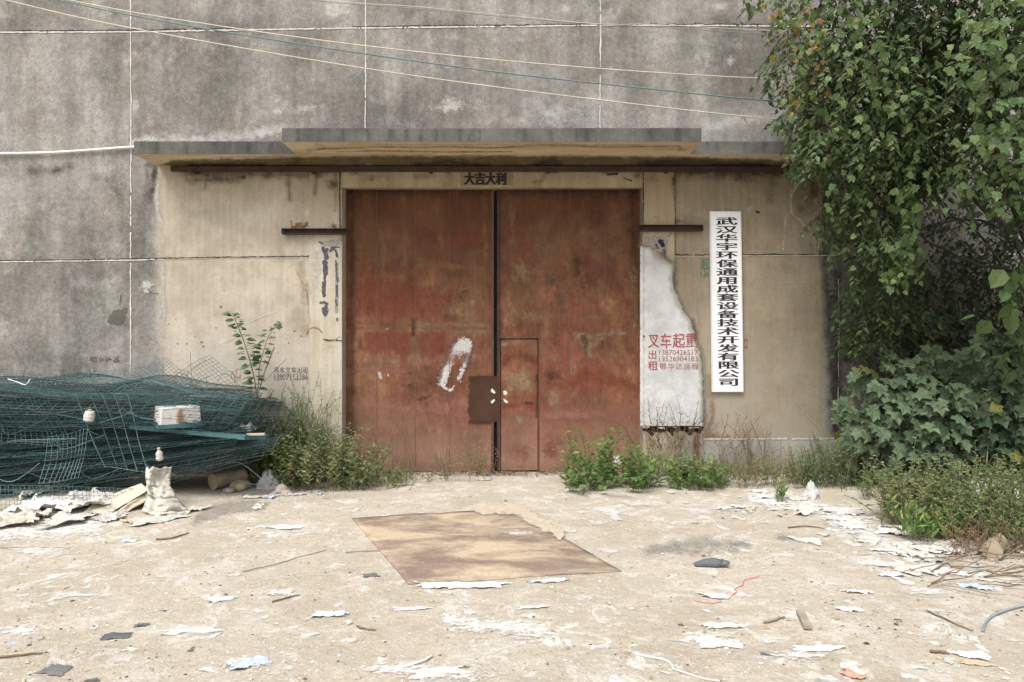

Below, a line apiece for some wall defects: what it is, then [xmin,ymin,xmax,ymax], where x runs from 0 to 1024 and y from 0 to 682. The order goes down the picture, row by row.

leakage [151,144,790,247]
spalling [643,234,671,255]